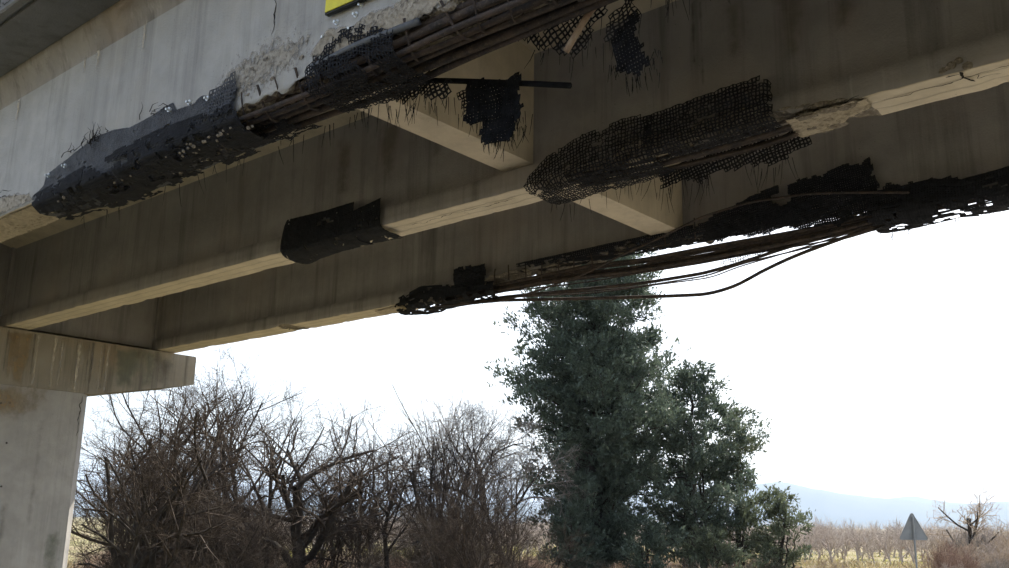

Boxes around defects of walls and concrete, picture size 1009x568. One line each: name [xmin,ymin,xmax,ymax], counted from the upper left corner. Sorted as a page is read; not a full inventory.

spalling [216,0,457,97]
peeling [778,98,871,138]